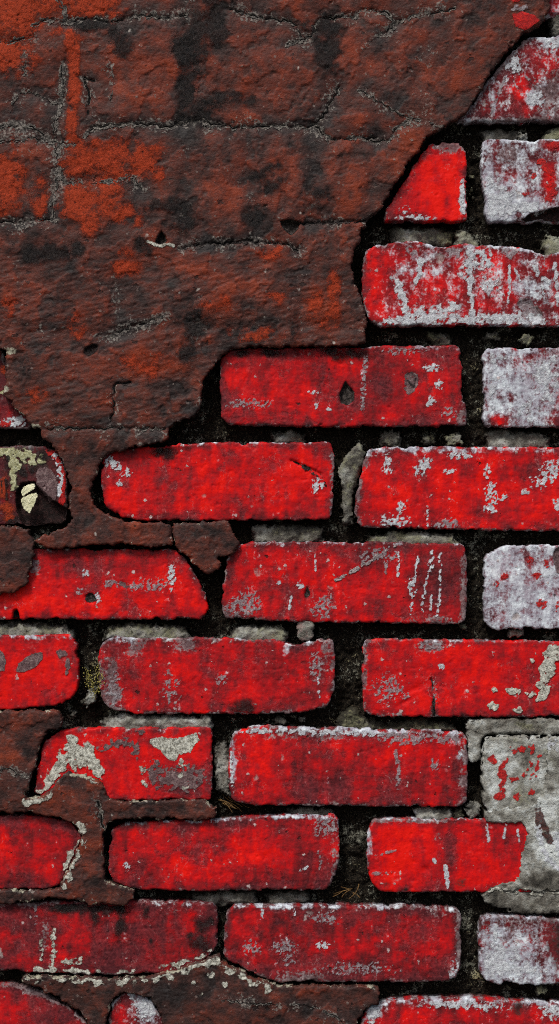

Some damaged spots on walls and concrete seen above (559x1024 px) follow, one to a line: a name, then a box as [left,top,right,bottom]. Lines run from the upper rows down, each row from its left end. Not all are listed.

damp [540,37,559,54]
damp [490,53,546,114]
damp [487,171,547,220]
damp [518,355,559,422]
peeling [0,447,66,524]
peeling [487,644,559,713]
peeling [22,730,210,807]
peeling [487,744,542,801]
damp [432,858,450,889]
flaking render [24,966,103,987]
flaking render [116,949,272,995]
damp [482,924,539,979]